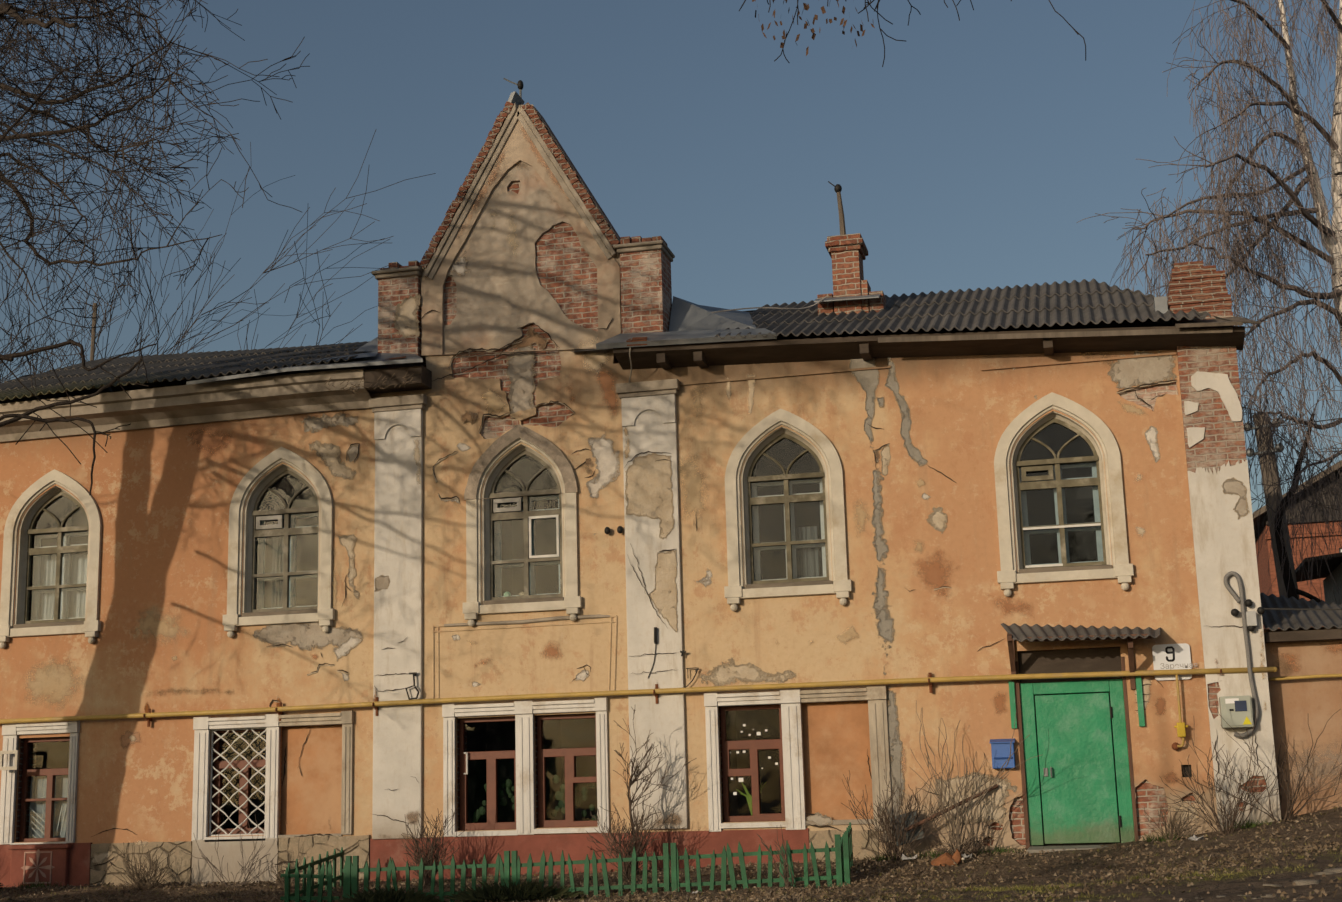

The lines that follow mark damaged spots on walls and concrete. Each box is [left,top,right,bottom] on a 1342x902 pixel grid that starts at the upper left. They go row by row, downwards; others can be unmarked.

flaking render [535,222,598,331]
flaking render [393,294,421,338]
flaking render [451,323,573,439]
flaking render [1107,350,1178,462]
flaking render [309,440,358,480]
flaking render [585,428,630,498]
crack [868,424,890,469]
flaking render [1222,478,1250,519]
flaking render [332,534,390,608]
flaking render [252,622,364,681]
flaking render [698,657,797,686]
flaking render [1130,779,1198,839]